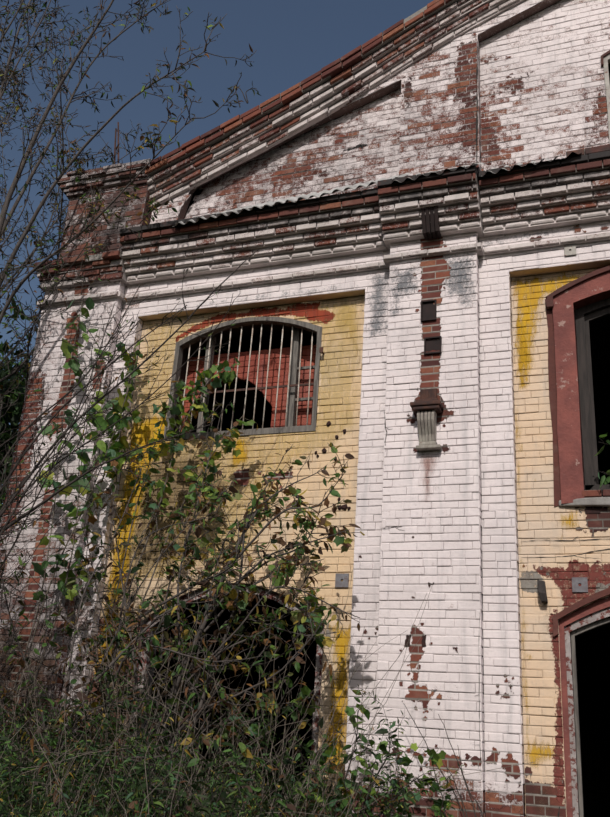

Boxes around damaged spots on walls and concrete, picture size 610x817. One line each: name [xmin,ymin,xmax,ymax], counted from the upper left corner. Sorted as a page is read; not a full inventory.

spalling [402,75,413,111]
flaking render [451,33,512,168]
flaking render [489,71,533,99]
flaking render [591,88,608,120]
water stain [371,268,415,335]
flaking render [413,237,452,312]
water stain [444,259,474,304]
flaking render [407,317,456,427]
spalling [575,507,610,537]
peeling [399,623,442,721]
peeling [522,559,610,805]
peeling [391,747,532,813]